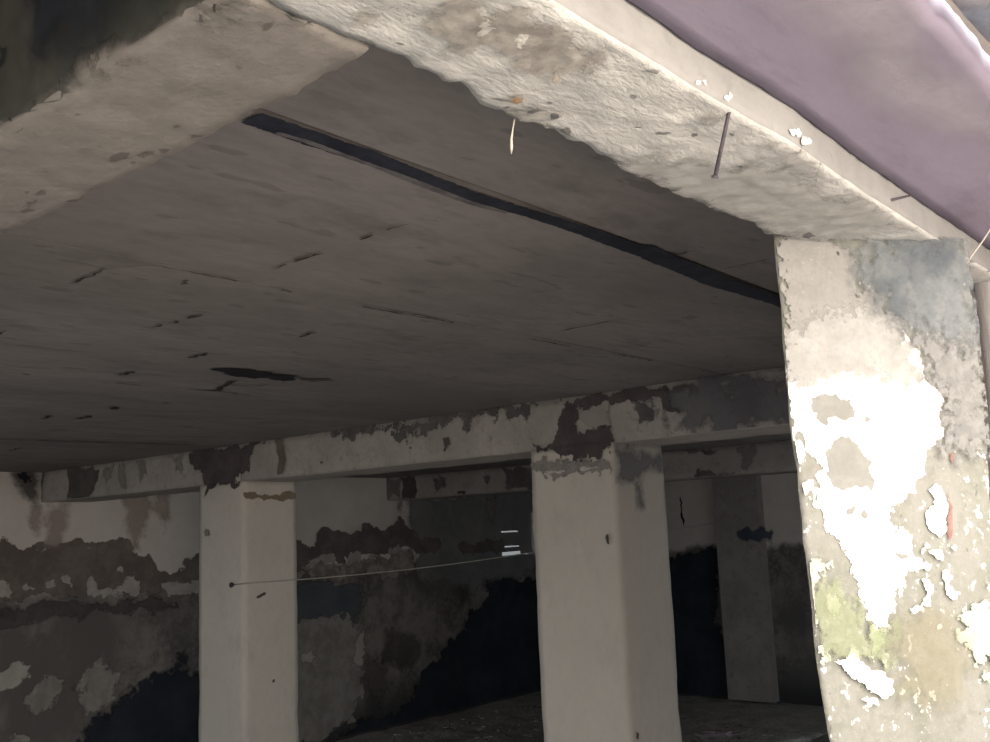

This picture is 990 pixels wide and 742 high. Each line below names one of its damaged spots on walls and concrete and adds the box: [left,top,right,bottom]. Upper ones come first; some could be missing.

water stain [0,0,309,121]
peeling [188,441,296,502]
peeling [530,384,698,481]
peeling [777,236,961,627]
peeling [0,536,199,603]
peeling [296,516,441,584]
peeling [0,660,64,715]
peeling [75,655,121,717]
peeling [297,612,367,742]
peeling [818,643,894,706]
water stain [900,610,966,707]
peeling [949,581,990,683]